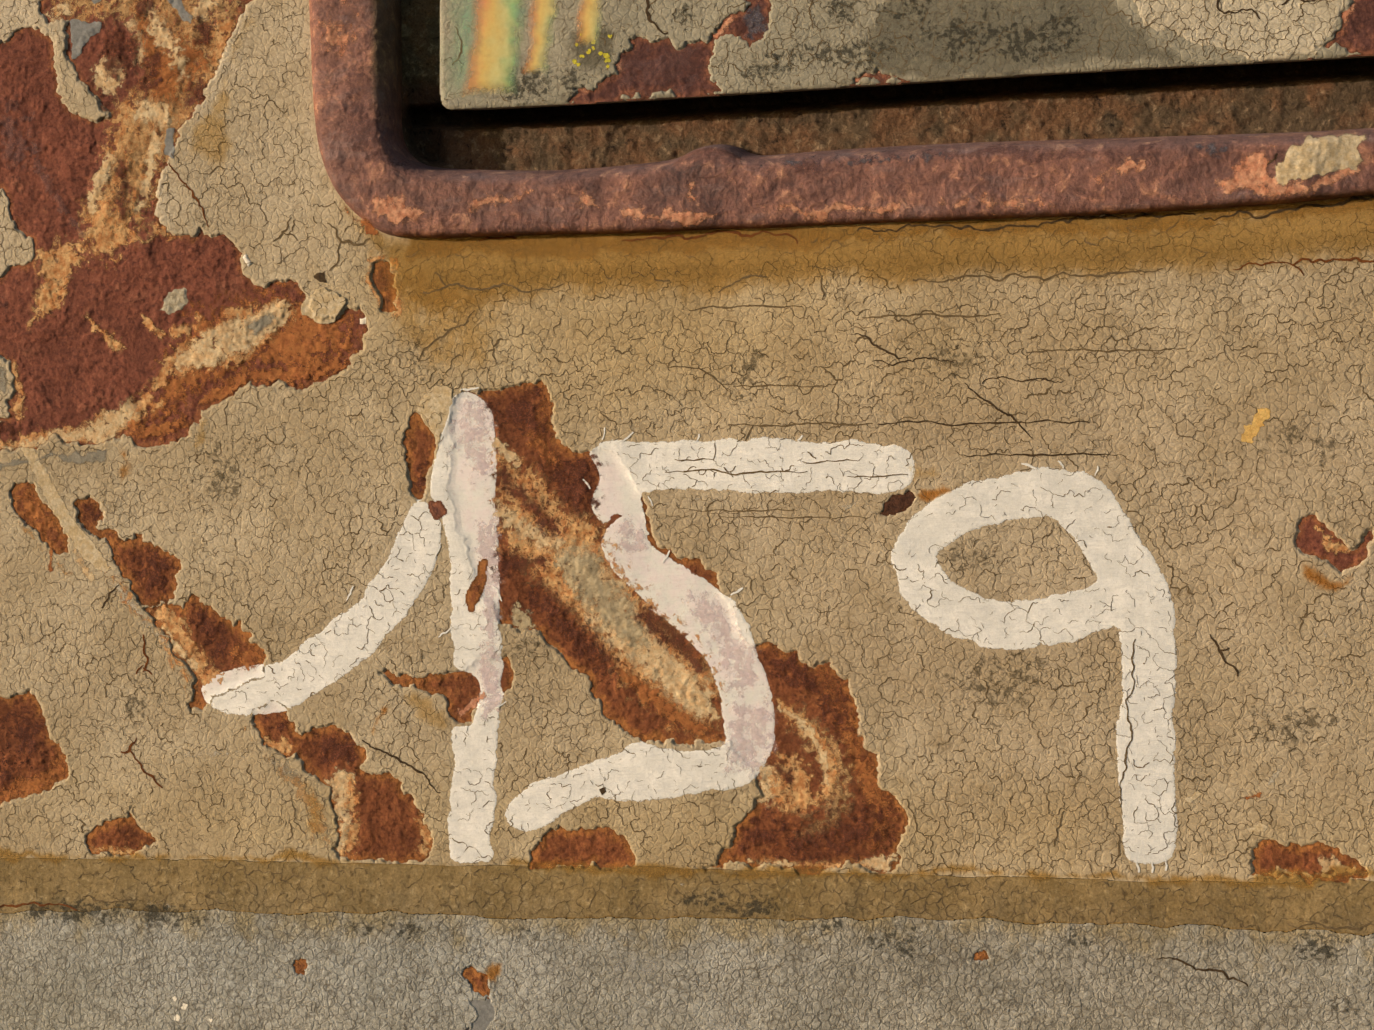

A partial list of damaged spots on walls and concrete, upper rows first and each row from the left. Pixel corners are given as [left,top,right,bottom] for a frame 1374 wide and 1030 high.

crack [0,0,88,113]
crack [444,0,1344,105]
crack [0,190,32,265]
corrosion [0,0,406,452]
peeling [301,271,346,324]
corrosion [74,497,266,711]
corrosion [467,380,732,746]
corrosion [0,690,69,805]
corrosion [245,711,433,865]
corrosion [706,642,908,875]
water stain [666,884,780,919]
water stain [1288,933,1349,965]